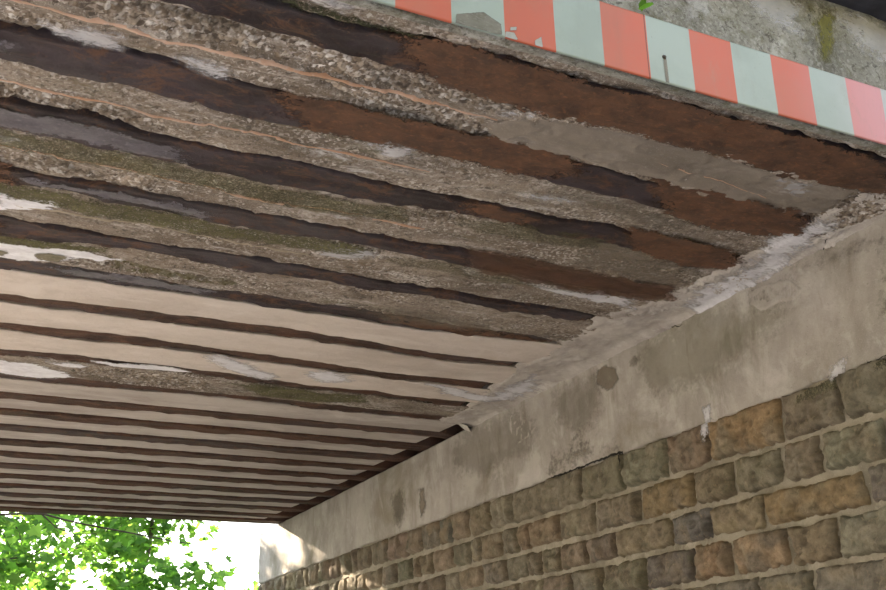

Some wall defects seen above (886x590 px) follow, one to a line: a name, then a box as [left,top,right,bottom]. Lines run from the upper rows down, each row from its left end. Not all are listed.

spalling [0,6,65,31]
spalling [53,0,532,138]
peeling [0,82,188,164]
corrosion [266,90,589,179]
corrosion [390,34,886,195]
leakage [0,193,59,210]
spalling [0,149,218,220]
corrosion [445,196,543,226]
leakage [0,243,121,262]
leakage [682,221,836,314]
leakage [0,360,189,379]
crack [551,451,623,478]